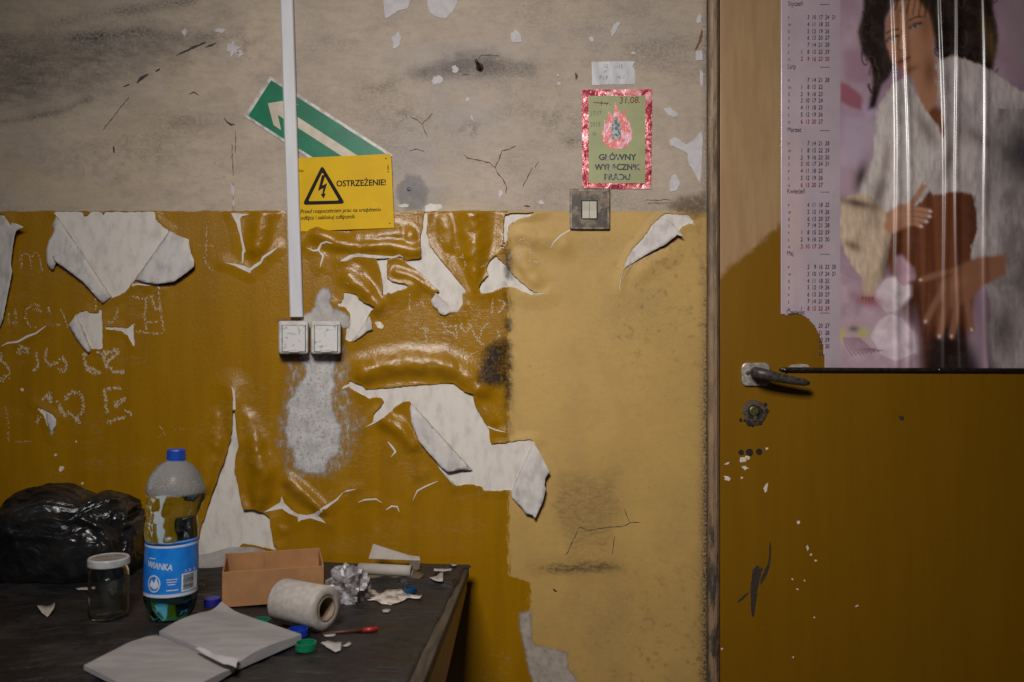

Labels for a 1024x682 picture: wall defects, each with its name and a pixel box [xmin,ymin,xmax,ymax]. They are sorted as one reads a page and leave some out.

crack [466,146,539,190]
peeling [669,174,680,192]
peeling [669,131,703,183]
peeling [0,209,23,338]
peeling [46,209,194,356]
peeling [612,210,702,298]
peeling [330,189,563,518]
crack [566,509,639,554]
flaking render [519,611,577,682]